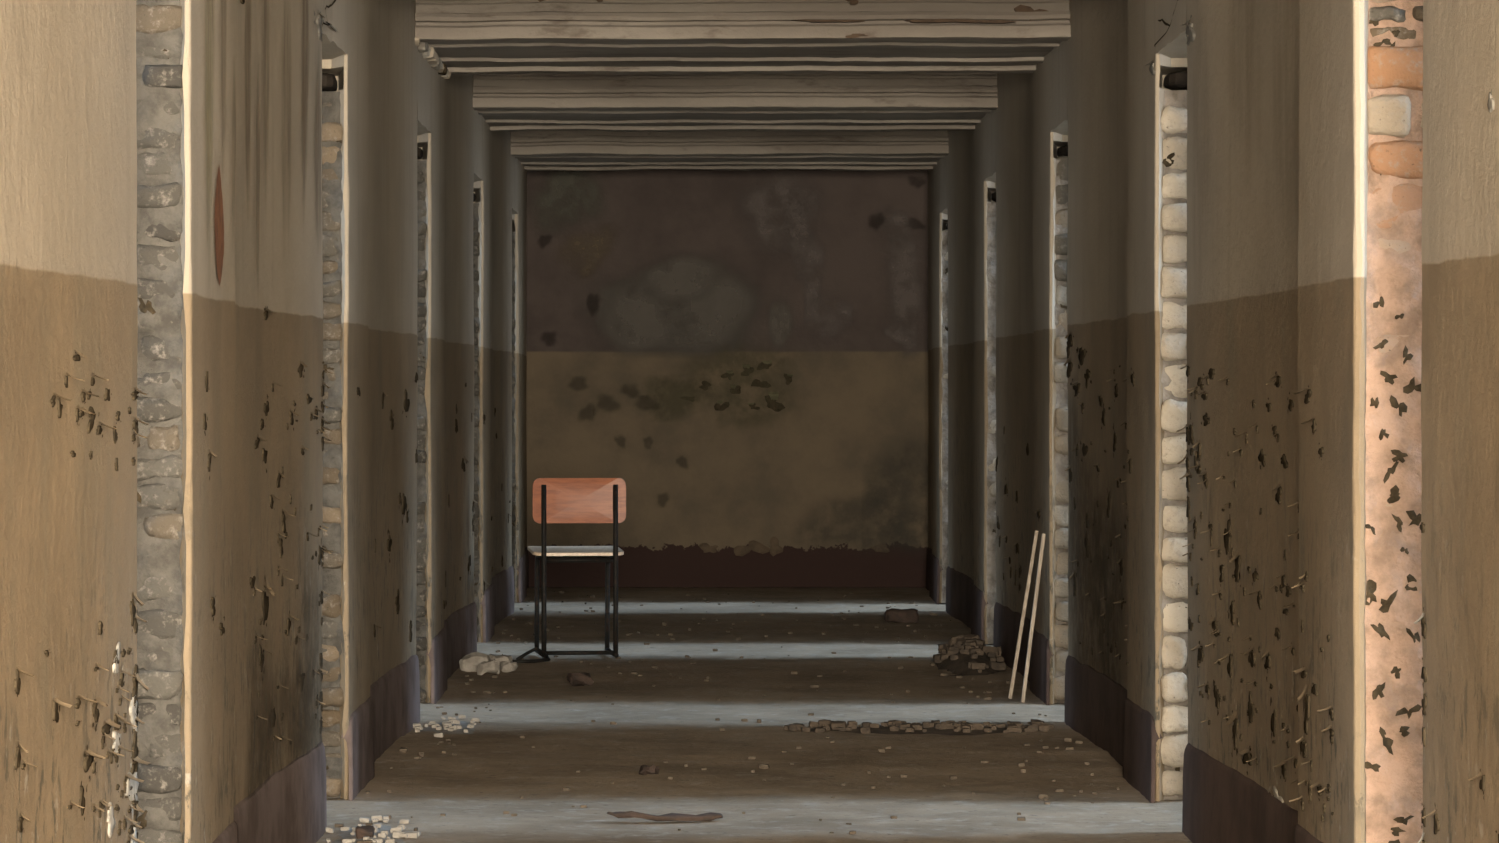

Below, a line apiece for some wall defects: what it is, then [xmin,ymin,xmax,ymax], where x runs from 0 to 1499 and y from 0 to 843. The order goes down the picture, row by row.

rust [215,166,224,286]
flaking render [50,0,184,843]
peeling [203,413,217,480]
flaking render [249,72,361,799]
flaking render [370,147,516,703]
flaking render [1034,145,1135,703]
flaking render [1145,60,1334,822]
peeling [210,596,225,636]
peeling [14,666,34,697]
peeling [14,741,38,772]
peeling [17,812,31,833]